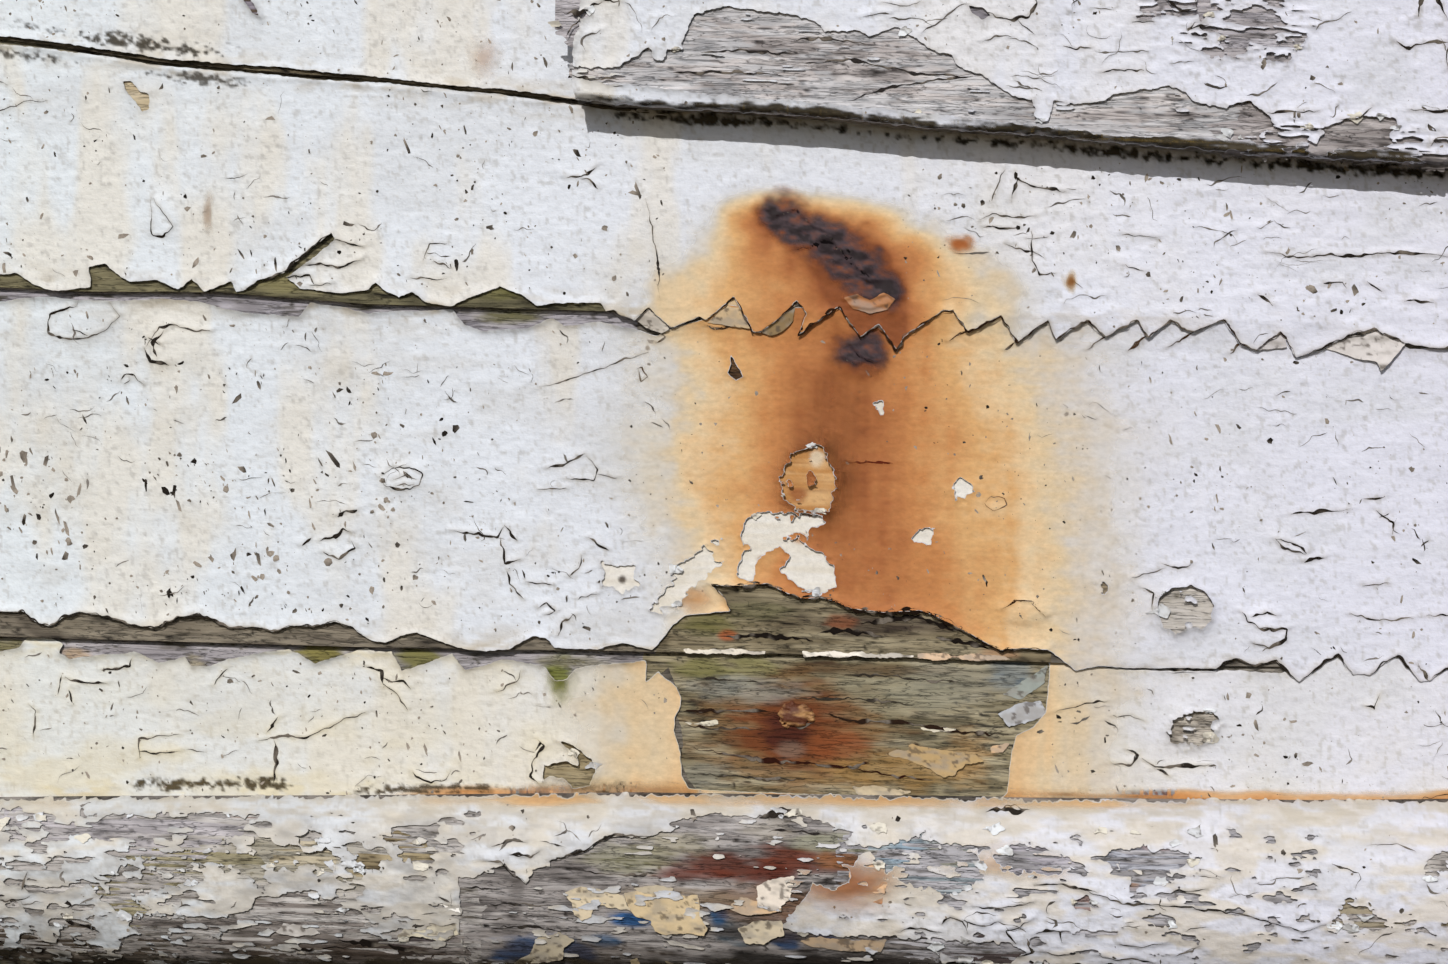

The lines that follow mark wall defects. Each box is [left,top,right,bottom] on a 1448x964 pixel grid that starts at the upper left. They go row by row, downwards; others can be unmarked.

peeling [124,81,150,111]
peeling [0,36,551,102]
crack [561,0,670,87]
peeling [548,0,1448,172]
crack [666,0,1371,120]
crack [1411,105,1448,146]
peeling [0,233,650,331]
rust [646,190,1448,807]
rust [415,661,708,805]
peeling [0,442,1448,964]